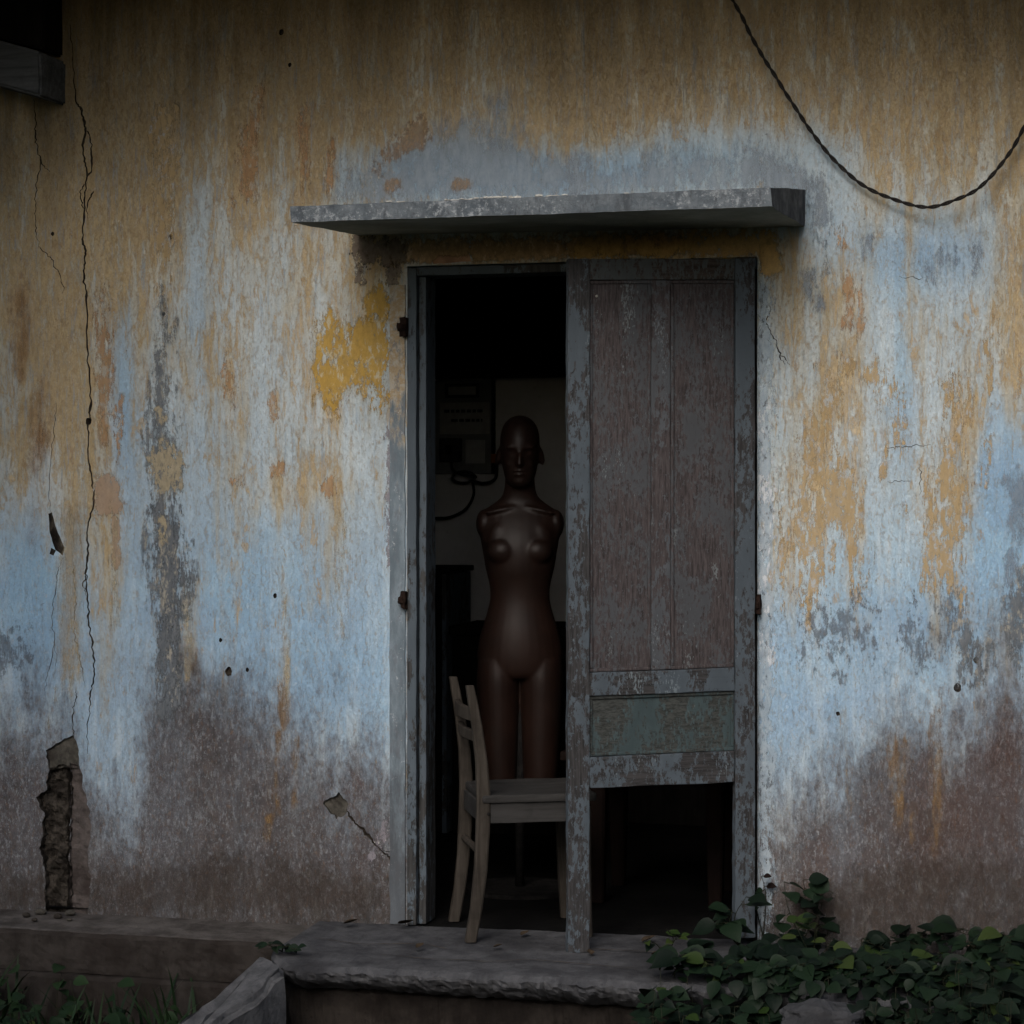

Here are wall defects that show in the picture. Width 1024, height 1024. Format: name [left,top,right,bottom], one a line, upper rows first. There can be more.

peeling [309,235,414,421]
crack [757,306,790,365]
crack [33,26,95,753]
spalling [48,512,64,556]
spalling [36,735,91,914]
spalling [323,792,349,819]
peeling [365,815,389,863]